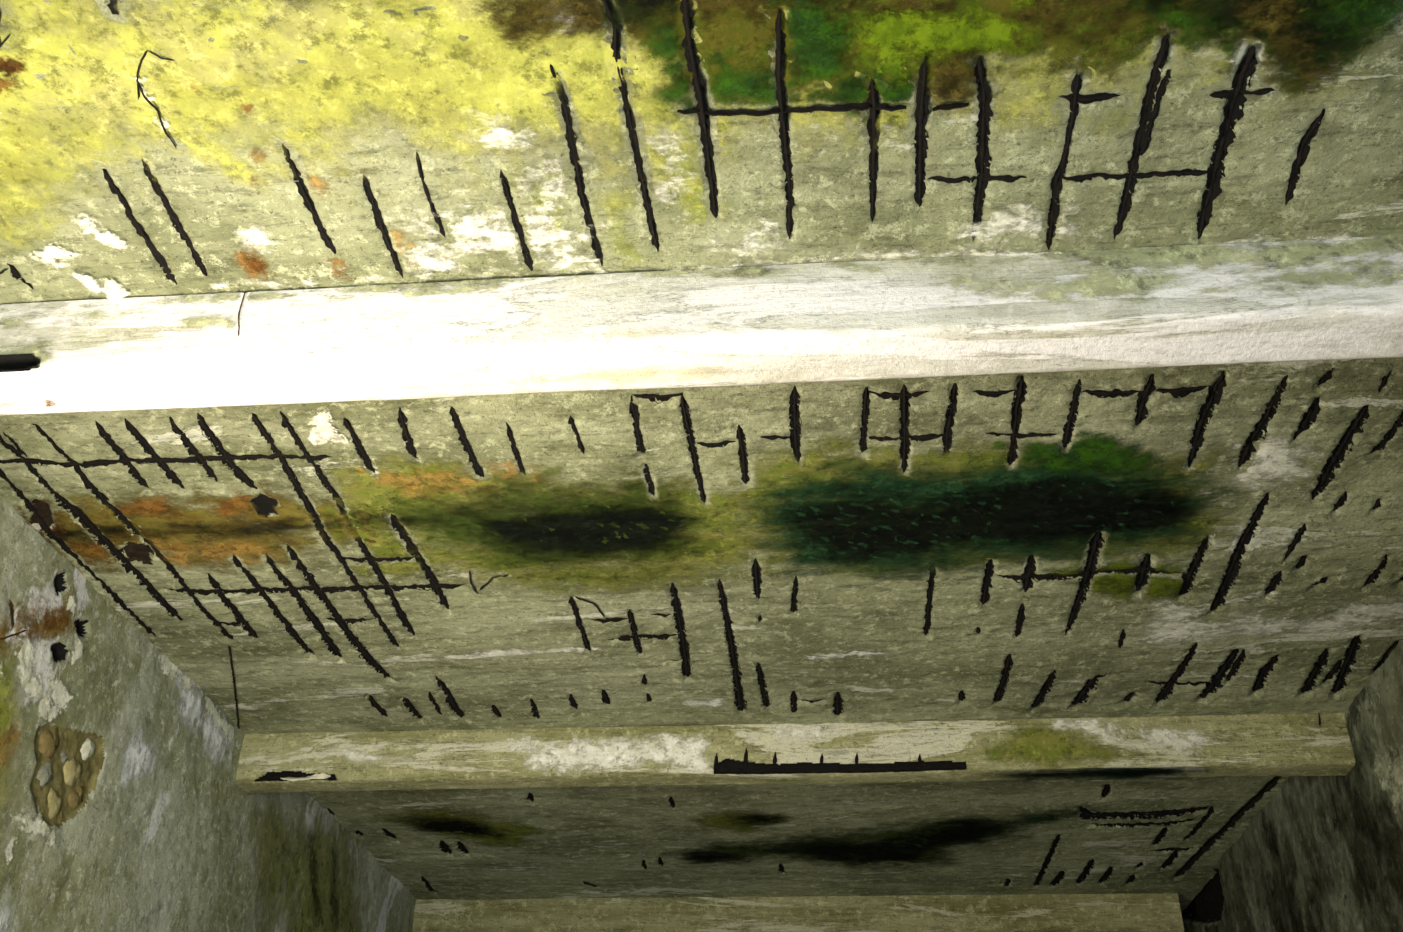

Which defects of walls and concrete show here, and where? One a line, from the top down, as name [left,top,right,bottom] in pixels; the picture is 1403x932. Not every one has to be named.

rust [0,56,25,92]
water stain [481,128,521,148]
rust [358,462,539,497]
rust [17,484,440,573]
water stain [321,432,1403,643]
crack [0,600,27,640]
rust [0,594,75,665]
spalling [0,407,469,865]
water stain [443,647,600,660]
crack [575,596,605,618]
water stain [684,810,1077,866]
crack [1175,776,1281,877]